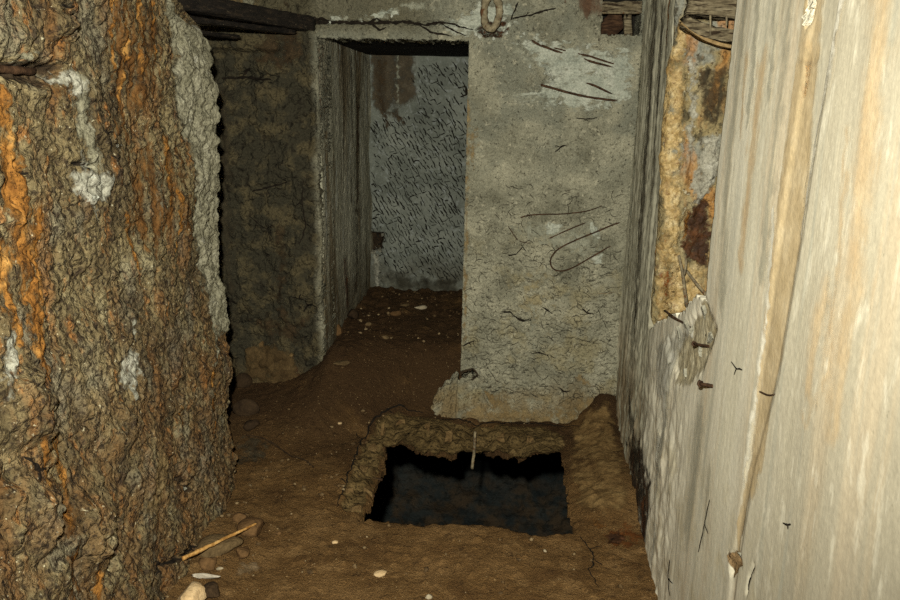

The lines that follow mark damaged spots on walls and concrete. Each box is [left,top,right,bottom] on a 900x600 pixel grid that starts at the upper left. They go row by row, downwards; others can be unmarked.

crack [316,17,473,36]
rust [681,199,711,268]
crack [463,184,624,400]
spalling [676,301,717,386]